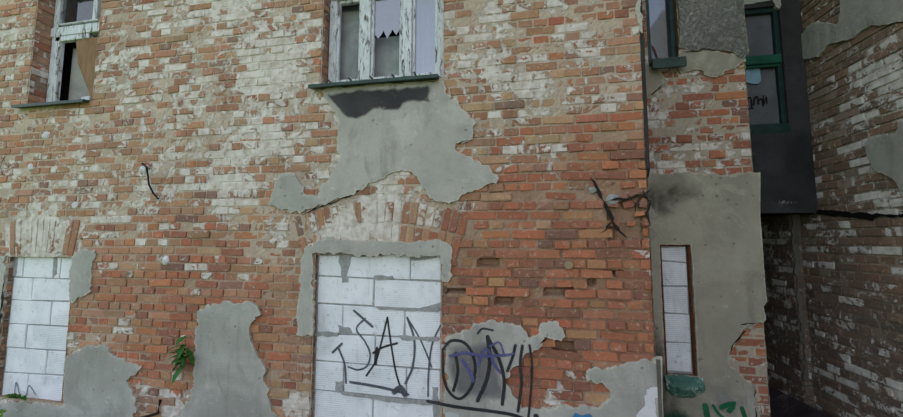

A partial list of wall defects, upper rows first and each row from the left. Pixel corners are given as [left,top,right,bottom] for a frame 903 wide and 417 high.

peeling [635,0,643,33]
flaking render [744,0,781,11]
peeling [677,49,746,78]
peeling [267,77,499,214]
flaking render [799,0,903,417]
peeling [0,255,8,338]
peeling [69,248,98,303]
peeling [442,171,767,417]
peeling [0,344,143,417]
peeling [172,300,279,417]